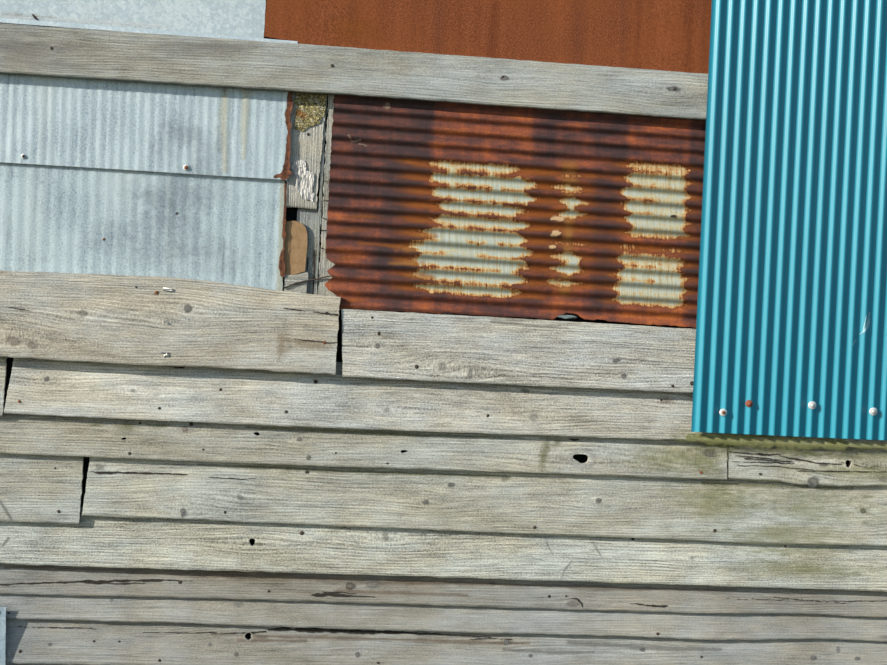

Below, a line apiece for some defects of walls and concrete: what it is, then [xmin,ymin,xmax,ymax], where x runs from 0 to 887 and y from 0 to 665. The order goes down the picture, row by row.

corrosion [274,91,293,277]
leakage [686,433,887,449]
crack [729,451,886,472]
crack [0,578,179,586]
crack [143,627,512,640]